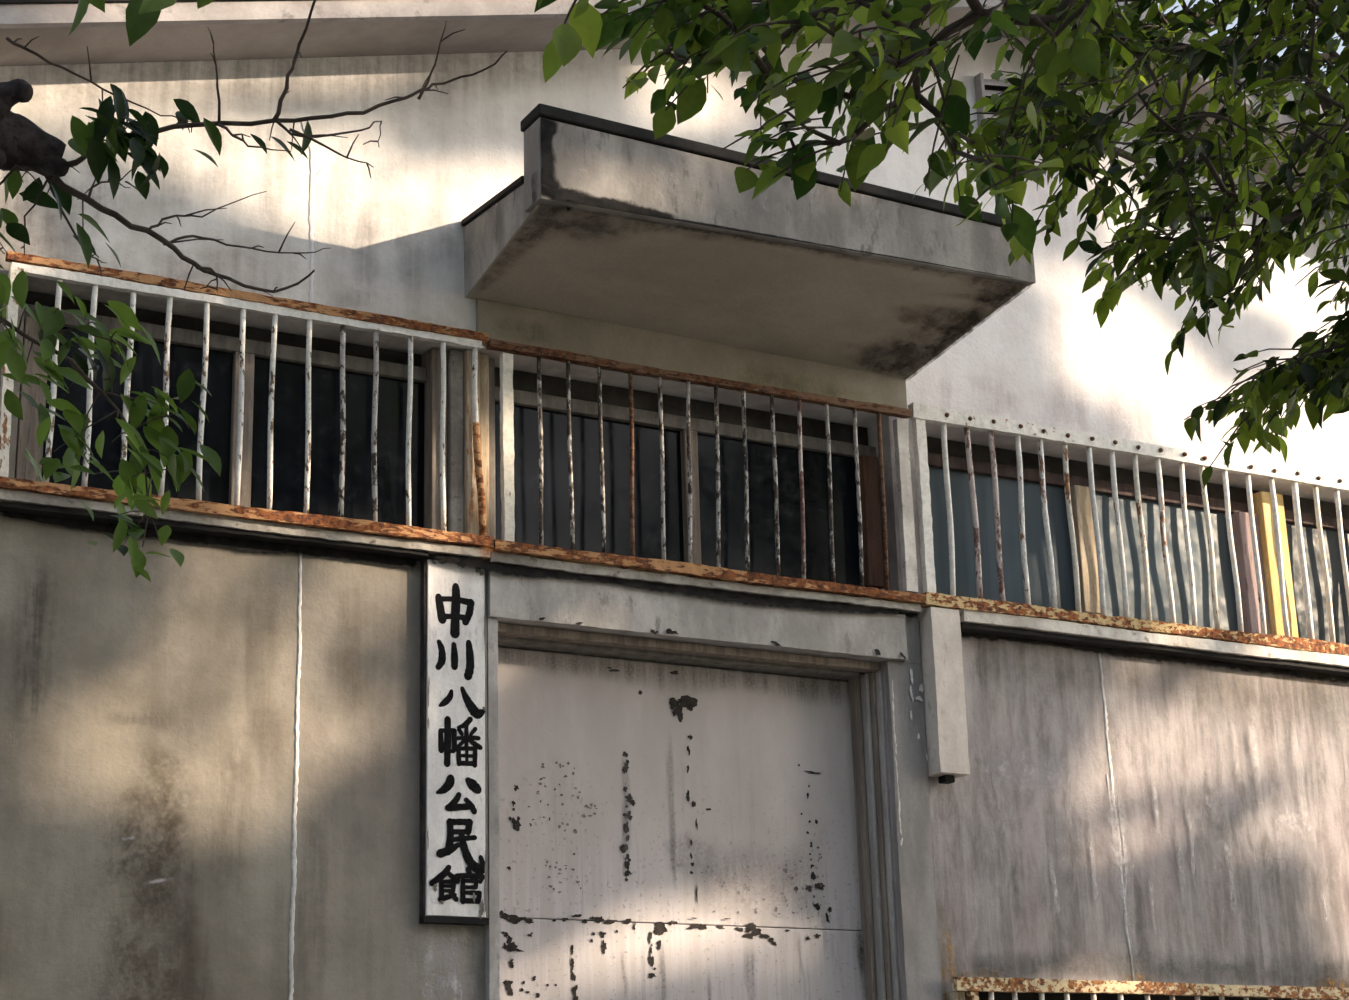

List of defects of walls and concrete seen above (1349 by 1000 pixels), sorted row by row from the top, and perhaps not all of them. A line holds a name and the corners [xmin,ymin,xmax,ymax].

leakage [515,118,1025,370]
leakage [961,632,1349,683]
peeling [669,695,698,773]
peeling [473,850,578,1000]
peeling [508,762,597,834]
peeling [552,751,832,988]
leakage [1109,796,1128,922]